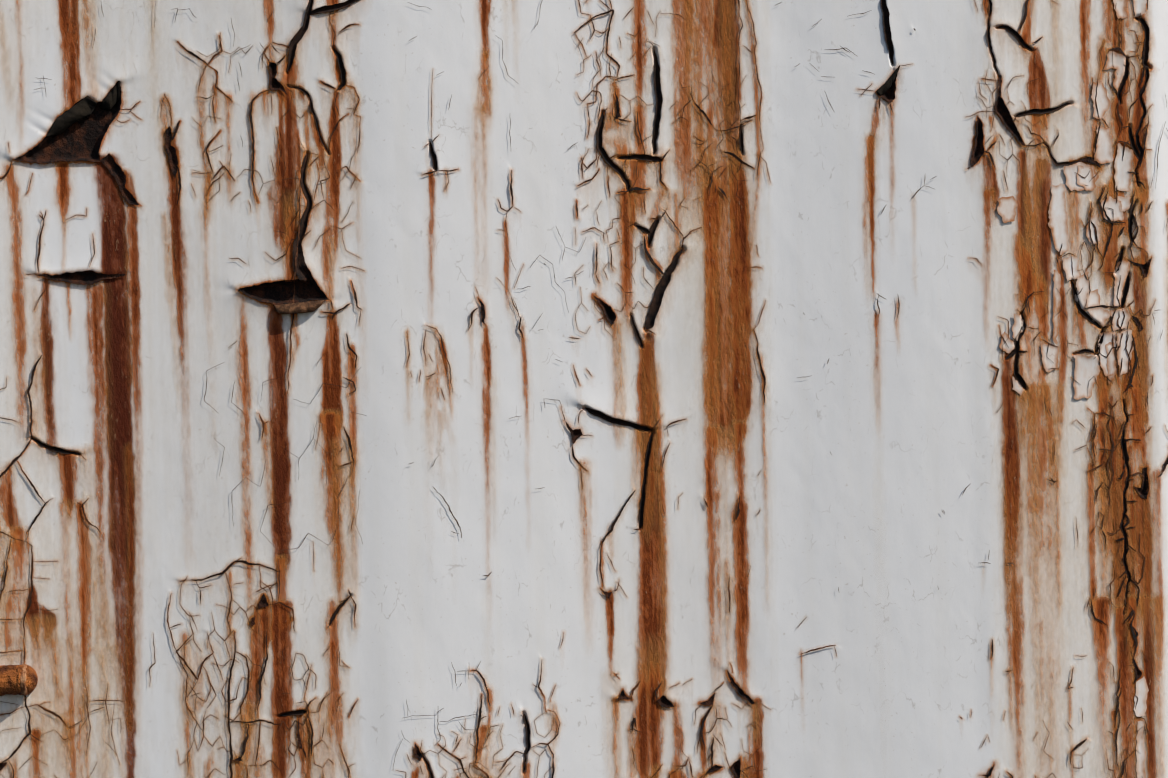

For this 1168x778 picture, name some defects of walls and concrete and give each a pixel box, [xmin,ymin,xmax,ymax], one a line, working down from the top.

rust [0,155,141,778]
peeling [0,81,142,207]
peeling [236,46,350,394]
rust [234,0,357,778]
crack [497,0,780,599]
rust [606,0,766,778]
peeling [668,663,755,778]
crack [795,0,915,111]
rust [1002,0,1087,735]
peeling [966,0,1153,400]
rust [1080,0,1163,778]
peeling [1115,606,1150,778]